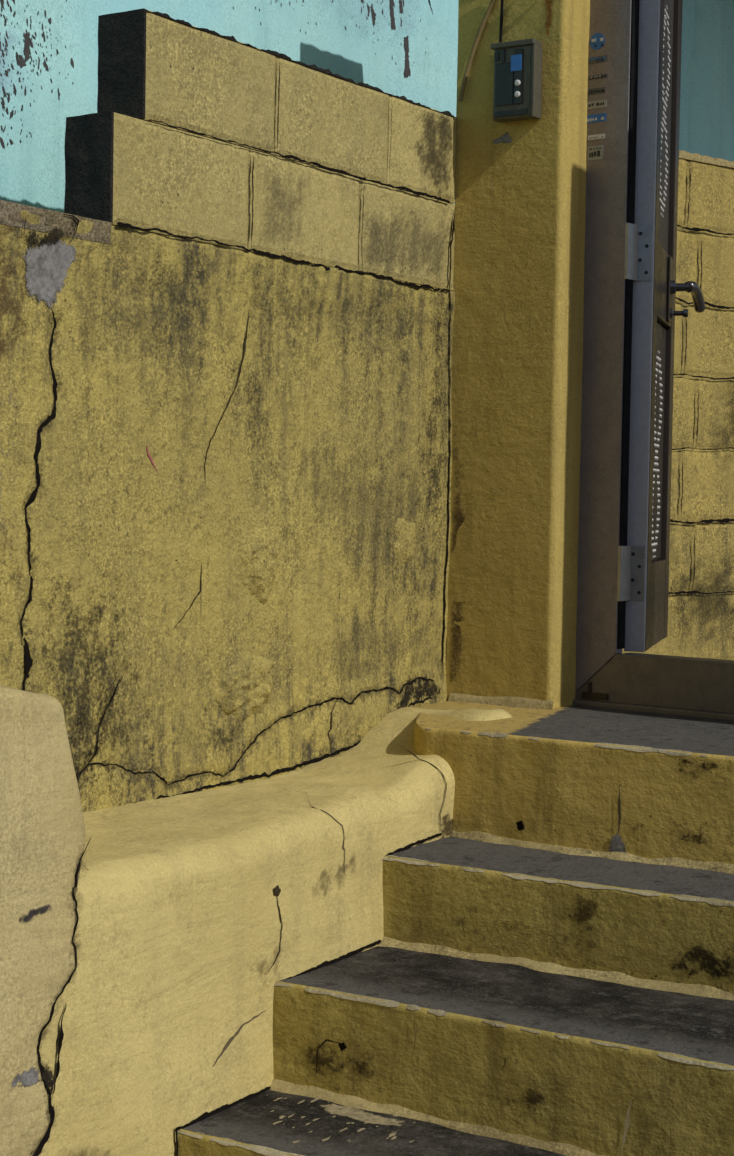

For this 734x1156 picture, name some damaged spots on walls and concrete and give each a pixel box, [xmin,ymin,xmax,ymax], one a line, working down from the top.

peeling [0,0,74,149]
peeling [345,0,411,78]
crack [20,308,57,691]
crack [76,63,456,875]
water stain [418,321,449,506]
water stain [443,494,465,550]
water stain [42,595,138,783]
water stain [450,601,463,678]
crack [31,838,91,1156]
crack [176,1087,271,1156]
crack [267,885,381,979]
crack [316,1039,346,1072]